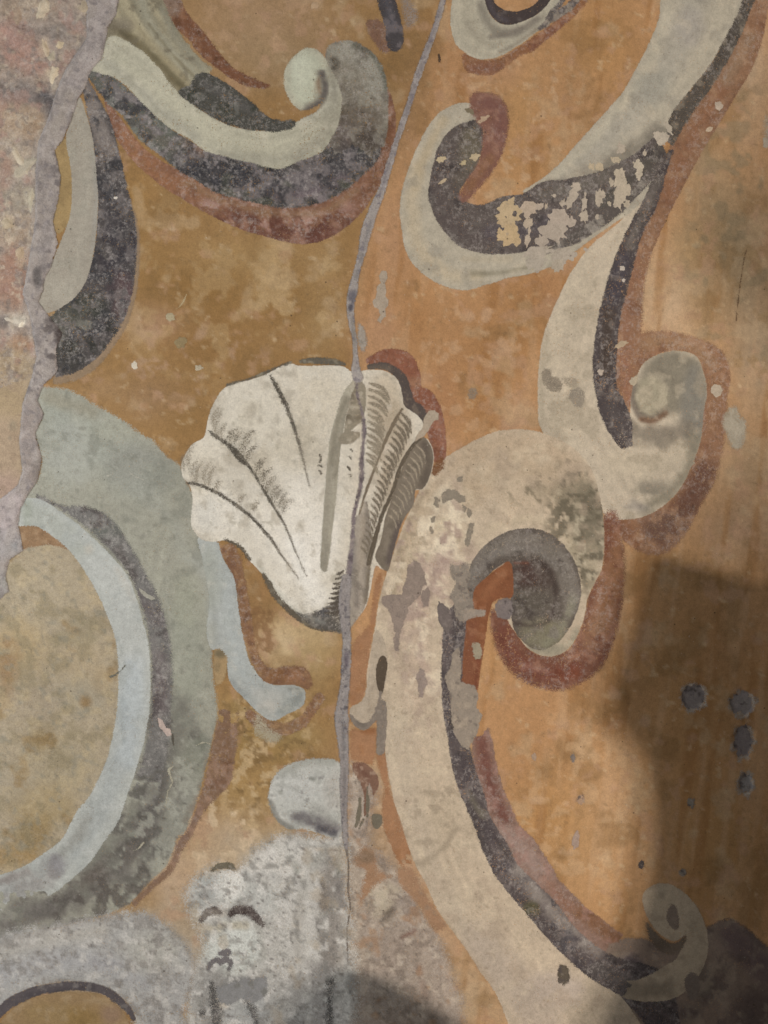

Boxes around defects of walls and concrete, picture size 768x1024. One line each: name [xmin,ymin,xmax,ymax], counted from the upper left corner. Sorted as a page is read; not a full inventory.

crack [0,0,119,599]
crack [334,0,446,962]
peeling [495,141,647,273]
peeling [653,121,673,146]